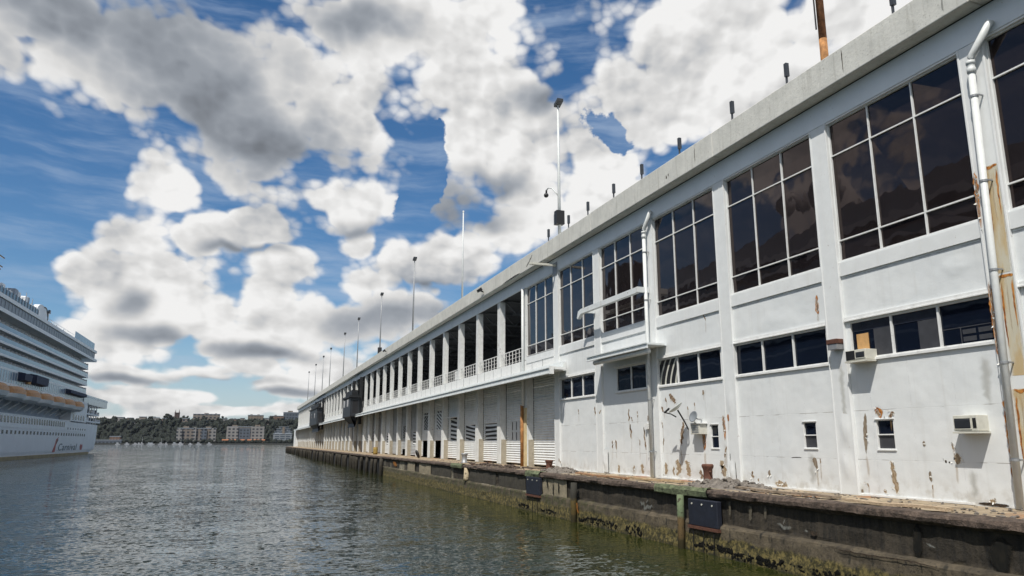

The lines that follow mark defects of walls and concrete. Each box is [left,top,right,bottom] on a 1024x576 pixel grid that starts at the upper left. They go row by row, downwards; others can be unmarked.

corrosion [973,163,1024,376]
peeling [661,390,704,446]
corrosion [1002,389,1024,477]
peeling [663,459,703,480]
peeling [884,461,900,495]